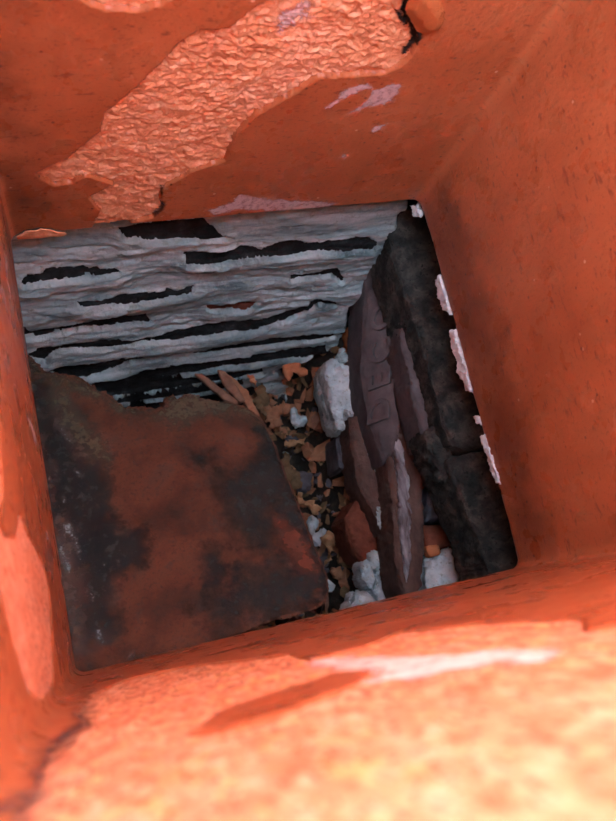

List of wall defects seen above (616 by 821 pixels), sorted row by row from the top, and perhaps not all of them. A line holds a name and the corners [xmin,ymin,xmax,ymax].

spalling [37,0,445,224]
spalling [17,228,67,239]
spalling [0,514,53,699]
spalling [28,355,329,672]
spalling [14,621,616,821]